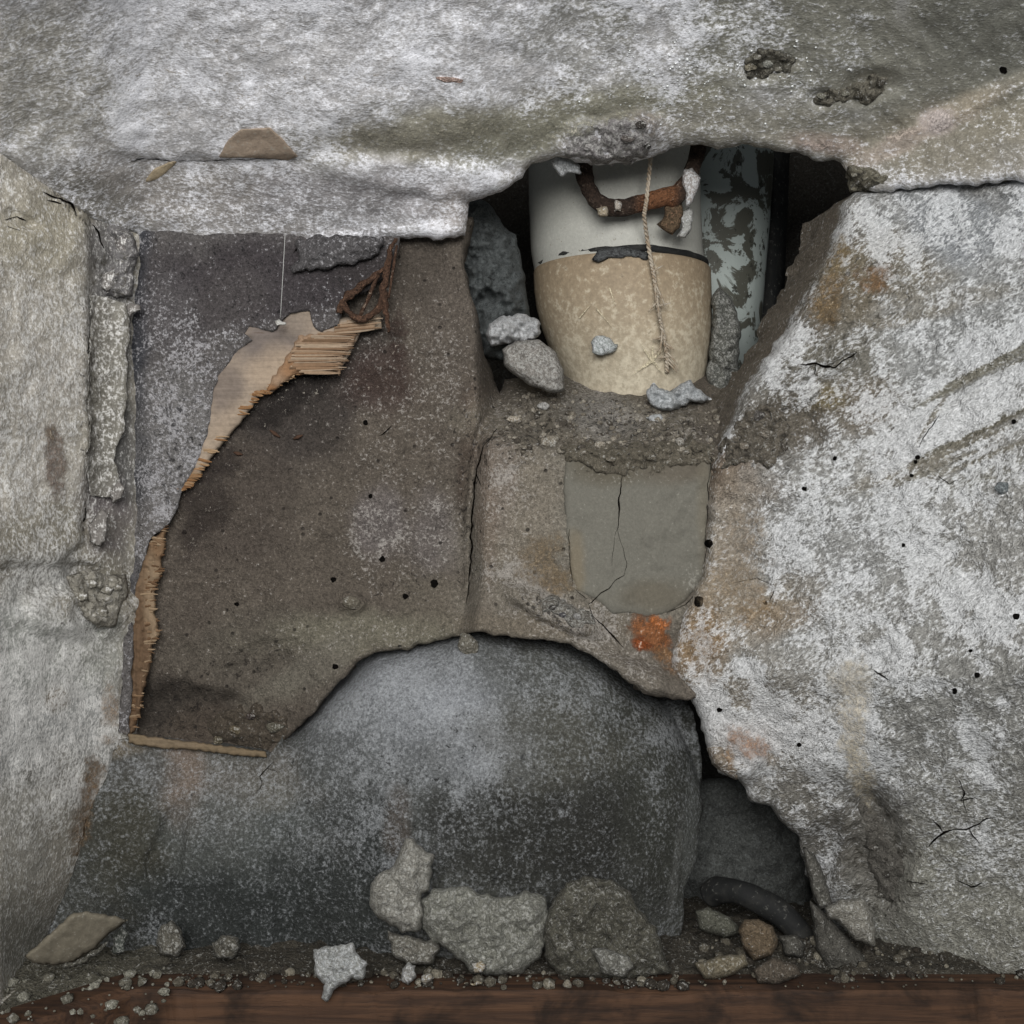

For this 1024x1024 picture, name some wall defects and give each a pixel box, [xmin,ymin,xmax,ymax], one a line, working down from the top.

spalling [564,117,652,166]
rust [575,144,707,238]
flaking render [291,234,385,273]
crack [466,429,497,602]
crack [568,478,627,647]
rust [632,615,673,670]
spalling [206,702,288,750]
crack [929,780,996,847]